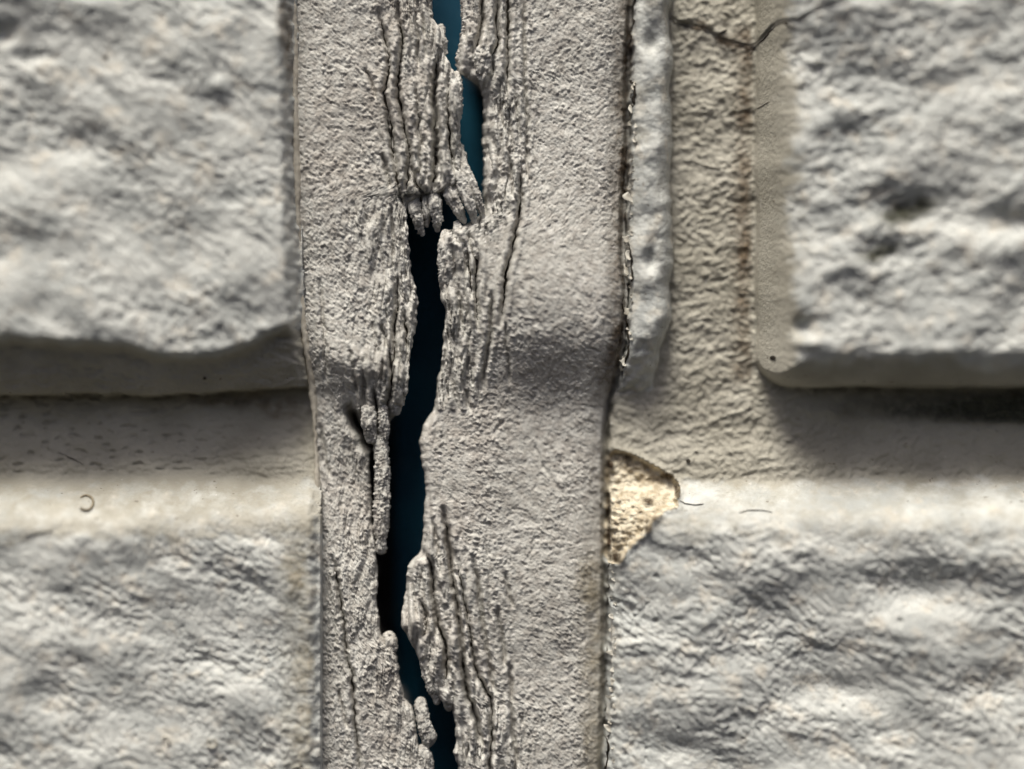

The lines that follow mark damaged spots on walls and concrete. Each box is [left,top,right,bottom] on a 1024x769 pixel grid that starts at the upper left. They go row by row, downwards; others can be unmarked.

crack [668,0,845,58]
crack [468,178,521,320]
crack [351,0,510,769]
spalling [604,450,680,564]
crack [335,570,360,768]